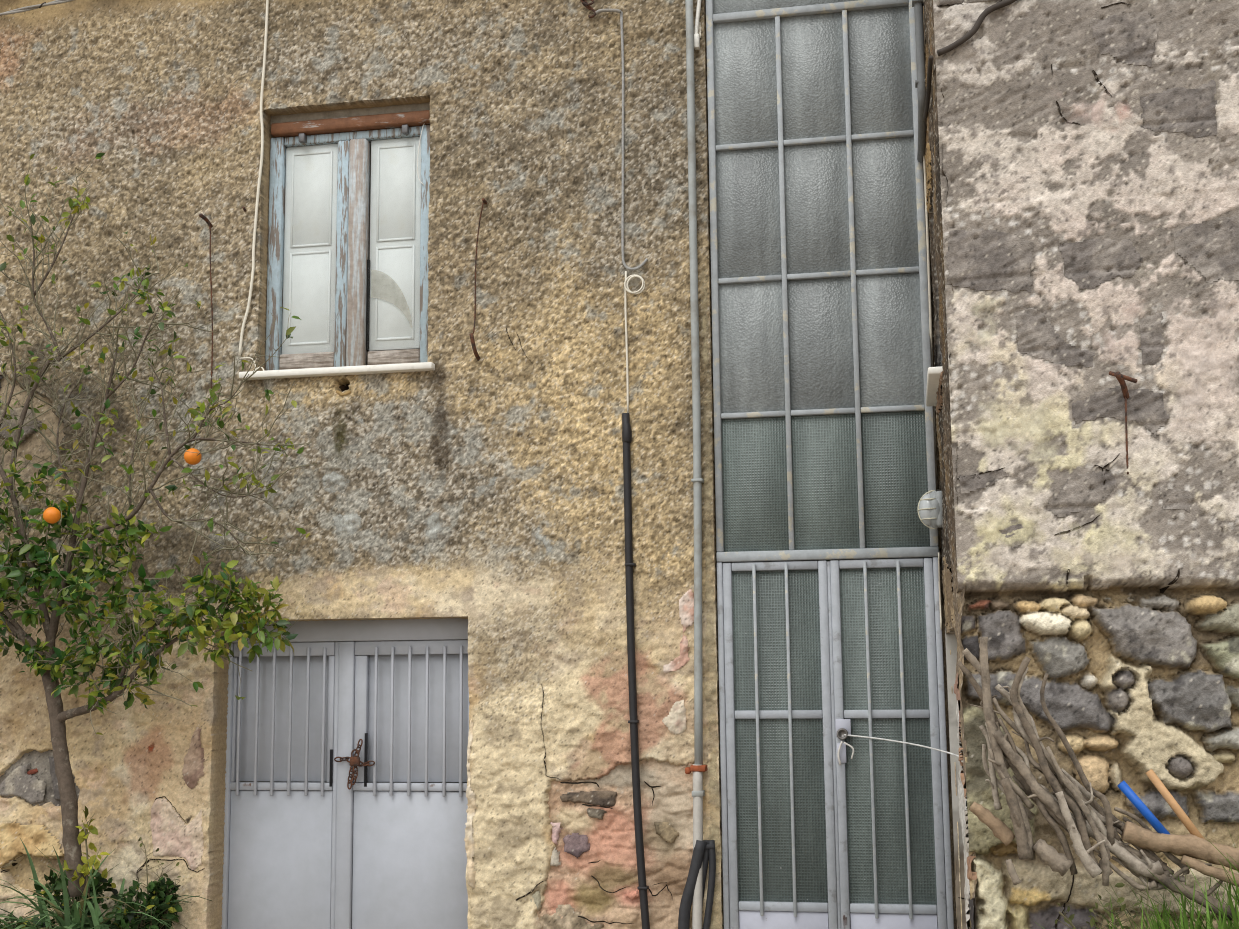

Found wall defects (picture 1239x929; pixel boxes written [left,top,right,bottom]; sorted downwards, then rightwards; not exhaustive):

spalling [0,357,65,486]
flaking render [663,589,694,673]
spalling [0,750,61,806]
spalling [530,758,693,929]
flaking render [662,700,687,735]
peeling [954,673,977,929]